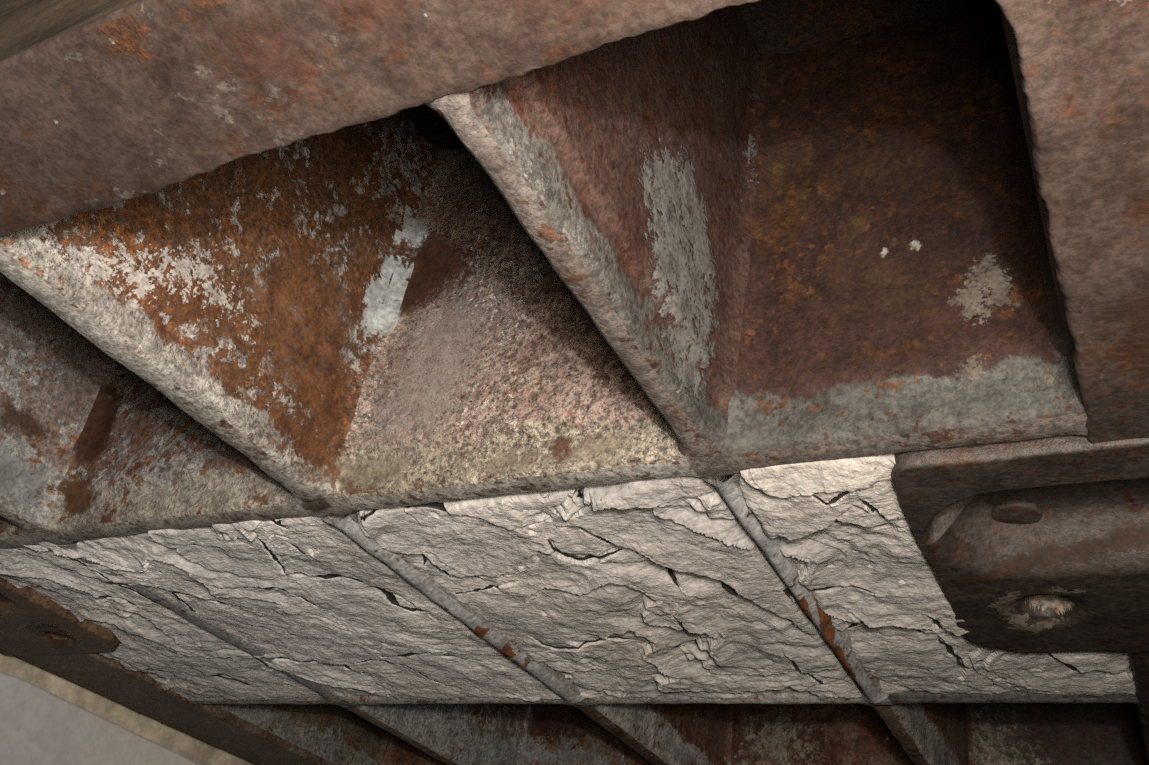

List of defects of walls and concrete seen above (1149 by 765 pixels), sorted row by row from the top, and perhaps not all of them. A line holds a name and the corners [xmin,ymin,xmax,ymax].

corrosion [144,244,377,494]
corrosion [0,403,49,438]
corrosion [73,386,117,462]
corrosion [55,477,97,517]
crack [359,502,473,521]
crack [548,489,679,587]
crack [812,491,889,526]
crack [18,520,481,686]
crack [783,585,872,628]
corrosion [793,596,864,694]
crack [914,616,969,669]
corrosion [731,706,841,765]